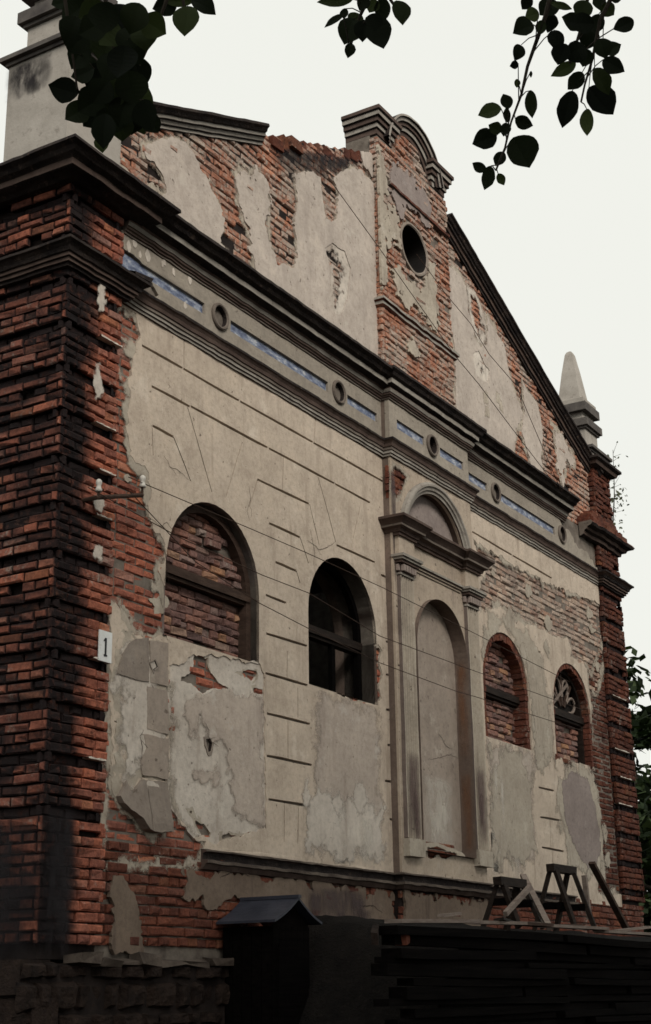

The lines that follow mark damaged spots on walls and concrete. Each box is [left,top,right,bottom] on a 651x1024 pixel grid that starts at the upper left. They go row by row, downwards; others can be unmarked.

water stain [10,62,48,92]
peeling [126,240,175,283]
flaking render [120,130,371,269]
peeling [325,243,350,315]
flaking render [107,306,169,640]
flaking render [447,241,627,542]
peeling [95,654,266,874]
flaking render [474,540,619,899]